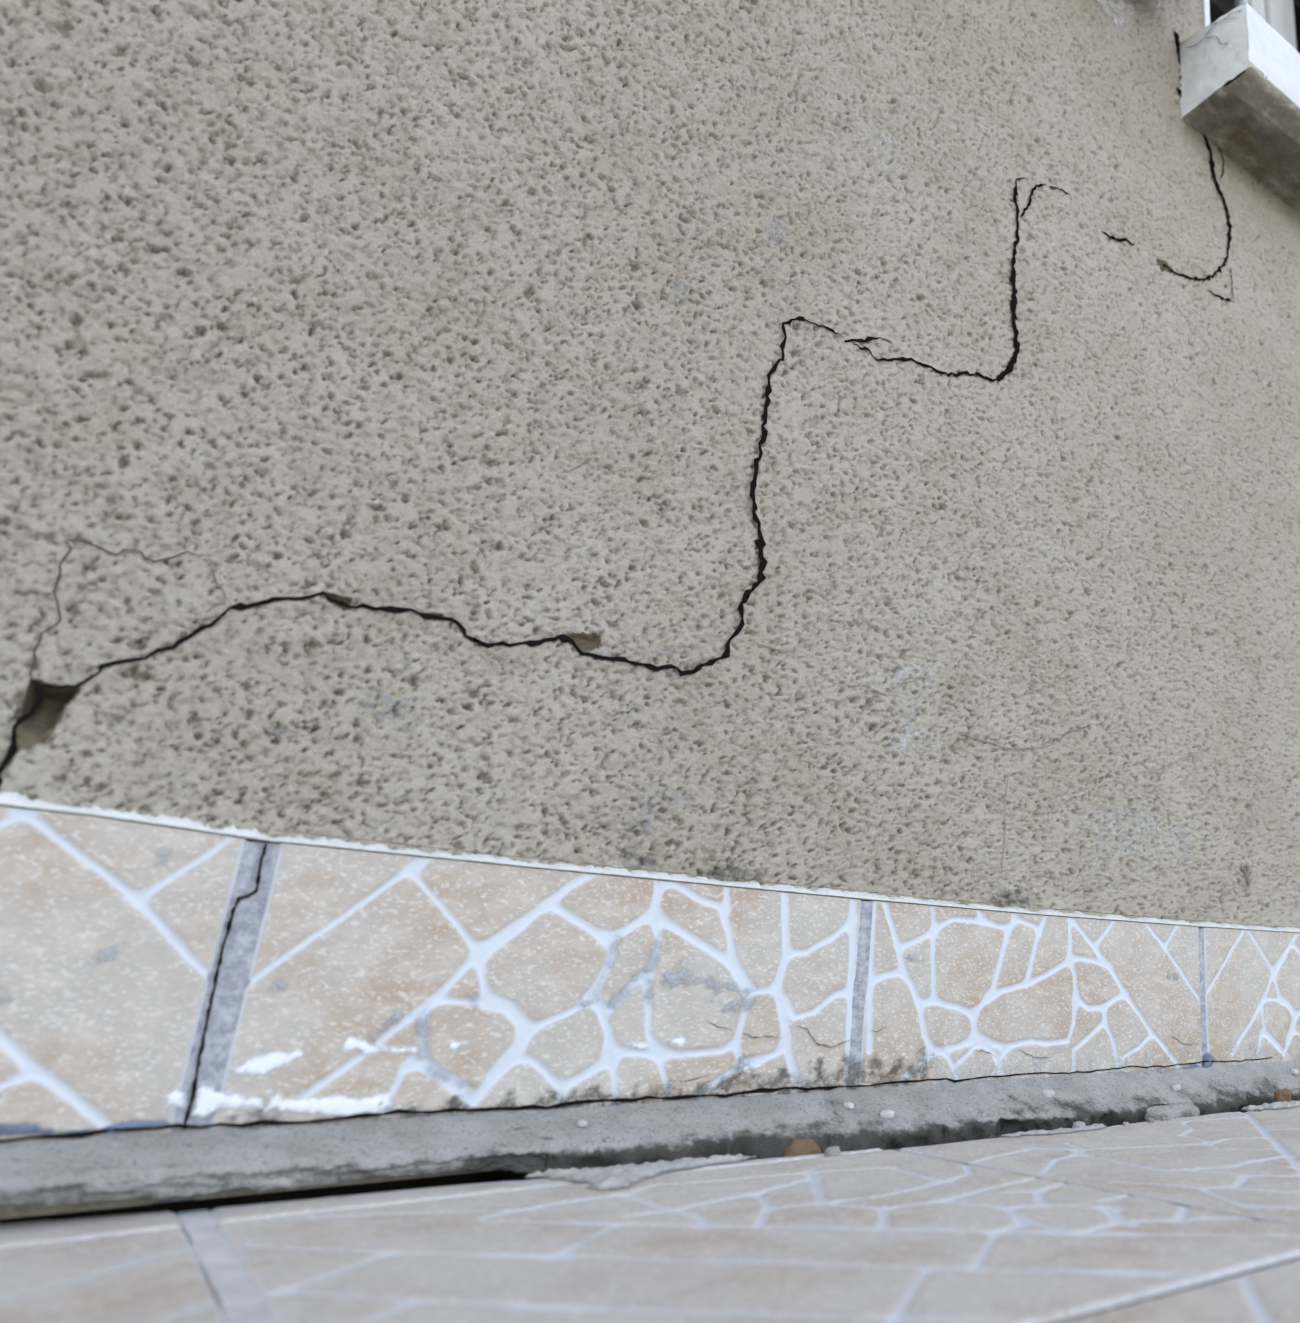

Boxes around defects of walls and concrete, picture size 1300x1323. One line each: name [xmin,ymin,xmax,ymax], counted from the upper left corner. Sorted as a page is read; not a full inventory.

crack [1174,10,1241,98]
crack [1102,231,1135,245]
crack [1163,131,1234,301]
crack [0,177,1070,786]
crack [0,724,1300,1143]
peeling [1183,1053,1215,1069]
peeling [0,1120,170,1135]